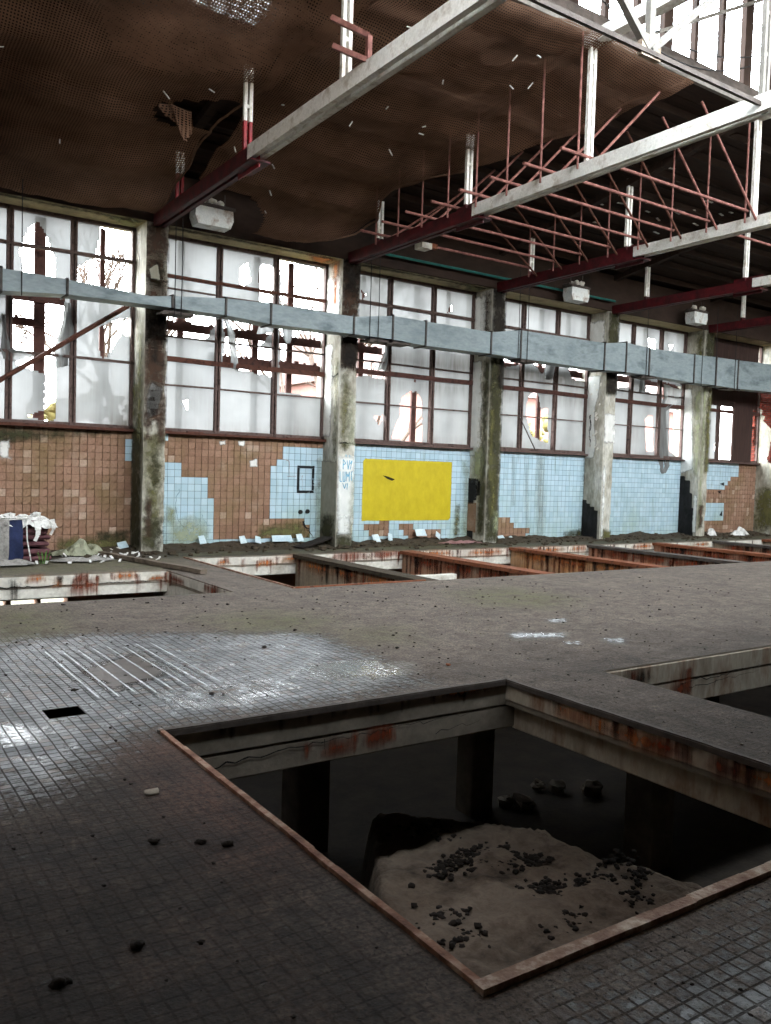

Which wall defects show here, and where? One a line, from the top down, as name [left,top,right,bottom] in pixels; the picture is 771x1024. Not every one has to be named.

water stain [0,193,507,332]
peeling [326,276,340,314]
water stain [57,309,204,552]
peeling [164,345,333,539]
water stain [258,336,359,547]
water stain [694,388,712,528]
peeling [678,389,771,536]
corrosion [57,572,138,595]
corrosion [151,572,184,588]
corrosion [256,541,771,583]
crack [214,710,480,769]